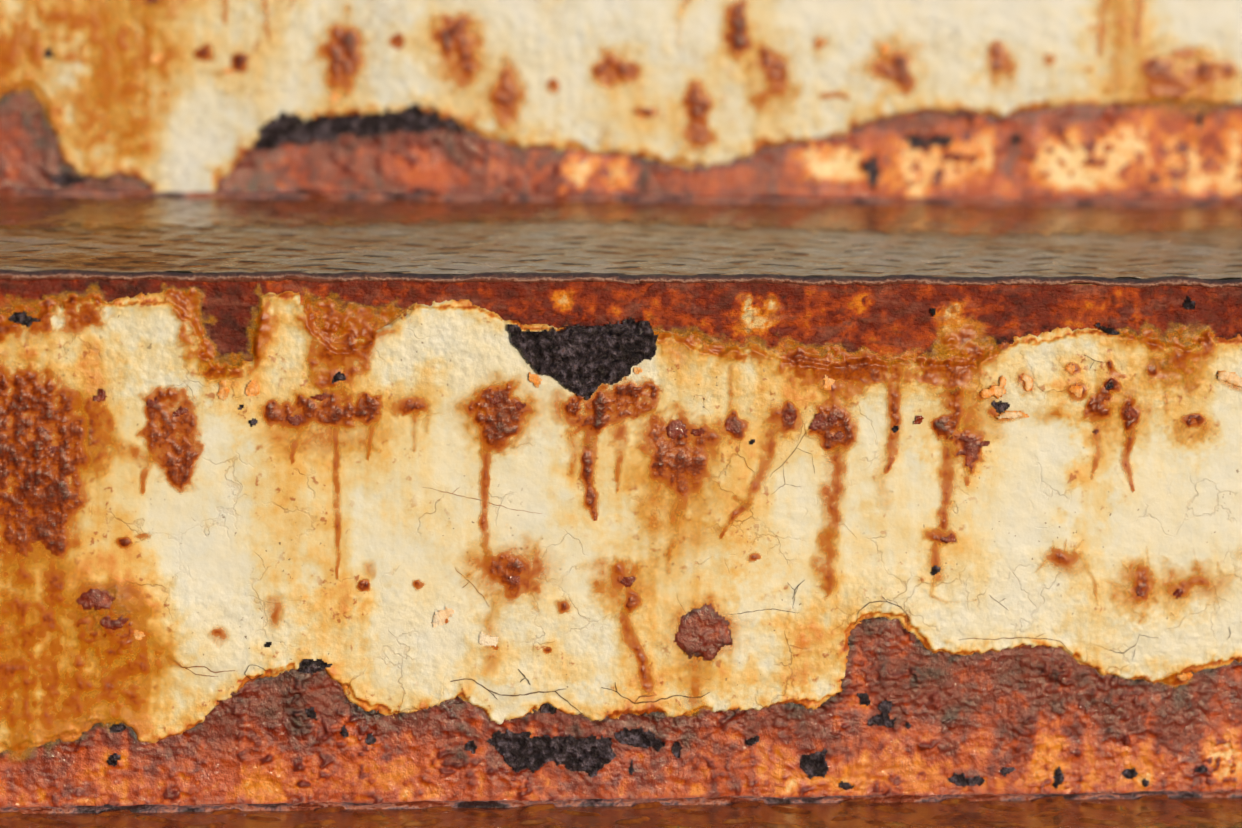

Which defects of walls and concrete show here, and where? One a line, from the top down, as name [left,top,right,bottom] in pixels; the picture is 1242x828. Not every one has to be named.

rust [318,24,364,102]
rust [724,0,796,111]
peeling [0,87,152,191]
peeling [216,99,1242,201]
rust [0,293,105,343]
peeling [0,279,1242,400]
rust [164,288,429,579]
rust [461,380,548,601]
rust [554,324,999,597]
rust [1065,360,1151,492]
rust [0,360,204,757]
peeling [0,617,1242,809]